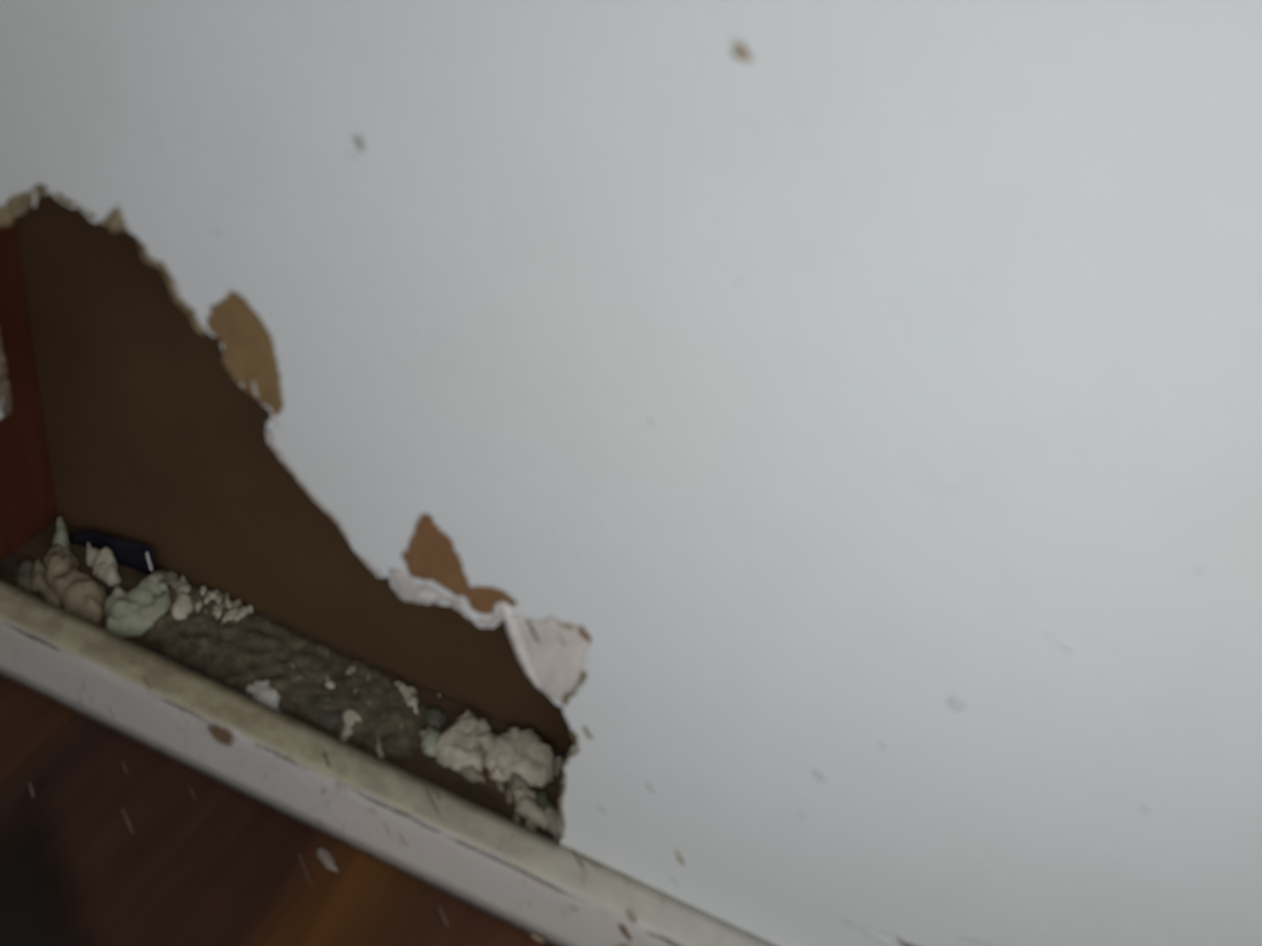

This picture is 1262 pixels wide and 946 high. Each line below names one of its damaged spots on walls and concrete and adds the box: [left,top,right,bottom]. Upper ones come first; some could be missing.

peeling [207,292,283,415]
spalling [402,514,591,706]
peeling [208,726,233,746]